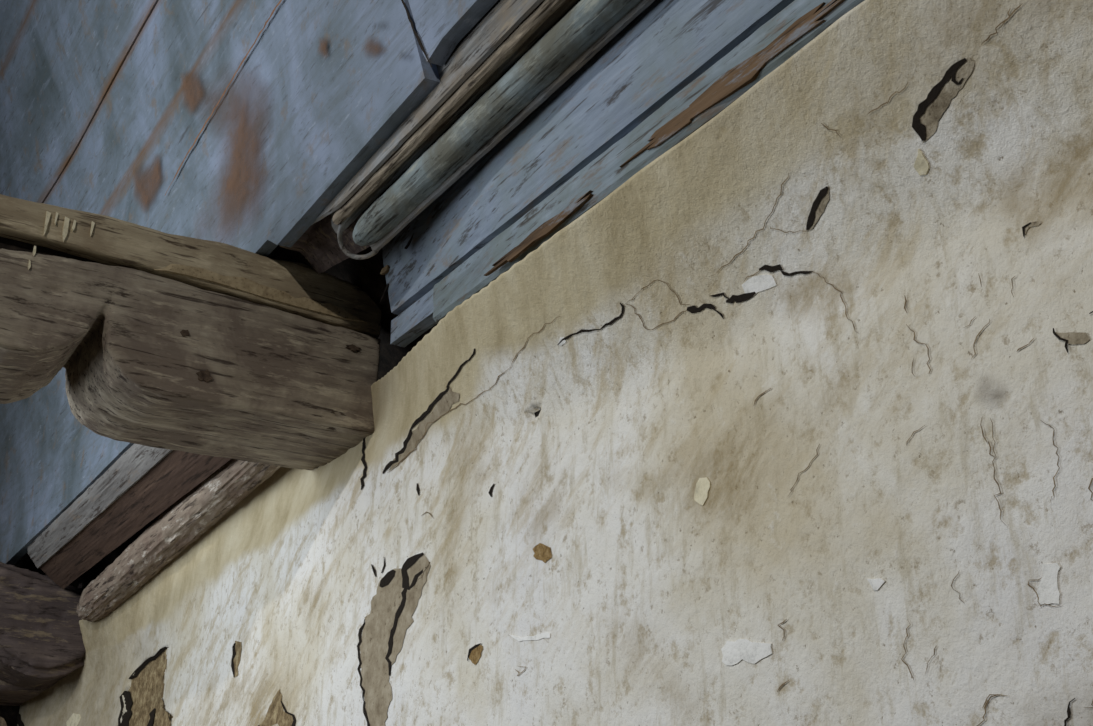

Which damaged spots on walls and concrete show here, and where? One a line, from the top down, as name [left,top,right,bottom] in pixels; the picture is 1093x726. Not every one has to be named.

peeling [620,0,845,168]
spalling [912,57,974,176]
peeling [484,190,594,276]
crack [360,171,858,490]
flaking render [118,647,173,726]
spalling [258,689,296,726]
flaking render [357,553,430,726]